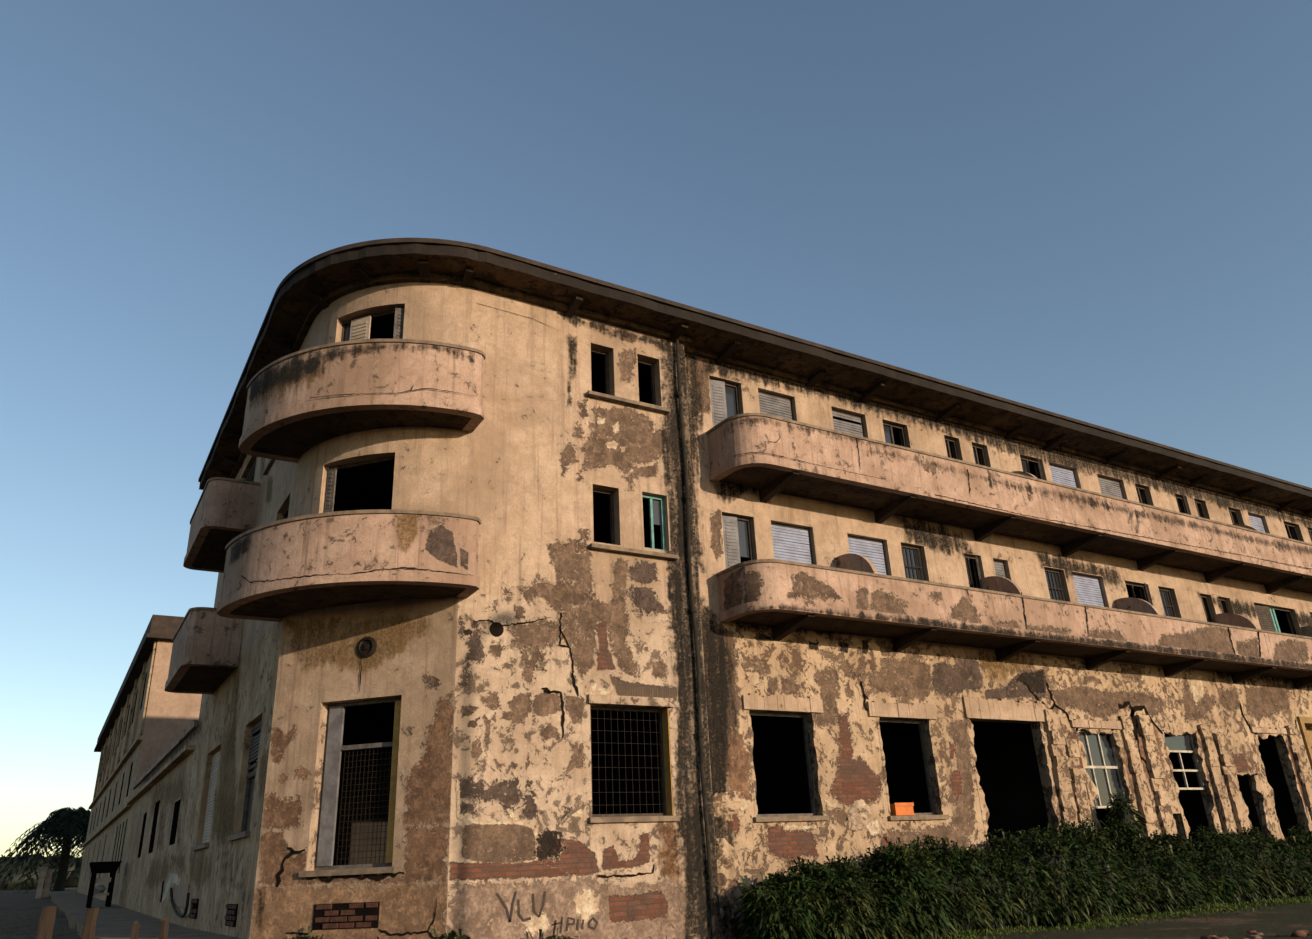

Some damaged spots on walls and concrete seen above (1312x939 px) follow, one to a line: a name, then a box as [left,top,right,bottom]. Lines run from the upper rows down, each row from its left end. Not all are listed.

flaking render [589,321,638,386]
flaking render [559,399,666,492]
flaking render [709,509,724,559]
flaking render [723,566,767,610]
flaking render [787,571,910,615]
leakage [561,312,1312,939]
flaking render [930,589,1127,641]
crack [474,613,579,738]
flaking render [250,524,692,939]
flaking render [703,626,1312,862]
crack [1118,701,1163,764]
crack [276,847,405,887]